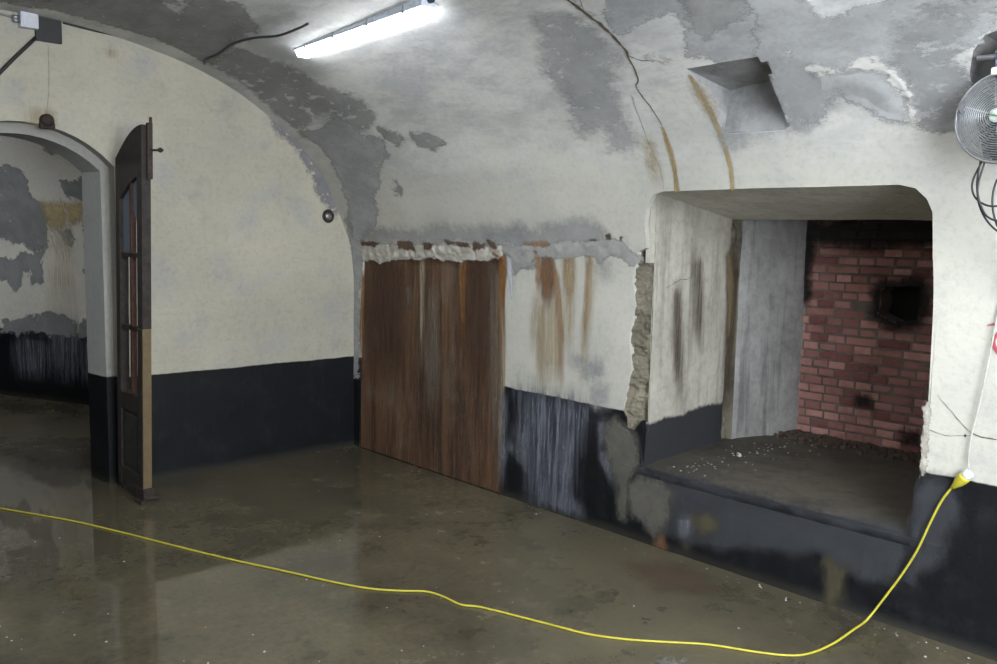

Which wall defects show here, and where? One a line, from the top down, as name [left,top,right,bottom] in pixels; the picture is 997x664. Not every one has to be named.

crack [567,0,674,189]
peeling [575,0,997,133]
peeling [0,0,503,379]
water stain [14,333,88,377]
rust [360,252,507,493]
water stain [501,392,588,512]
rust [534,256,574,366]
rust [584,259,592,336]
peeling [500,233,906,585]
peeling [900,402,959,585]